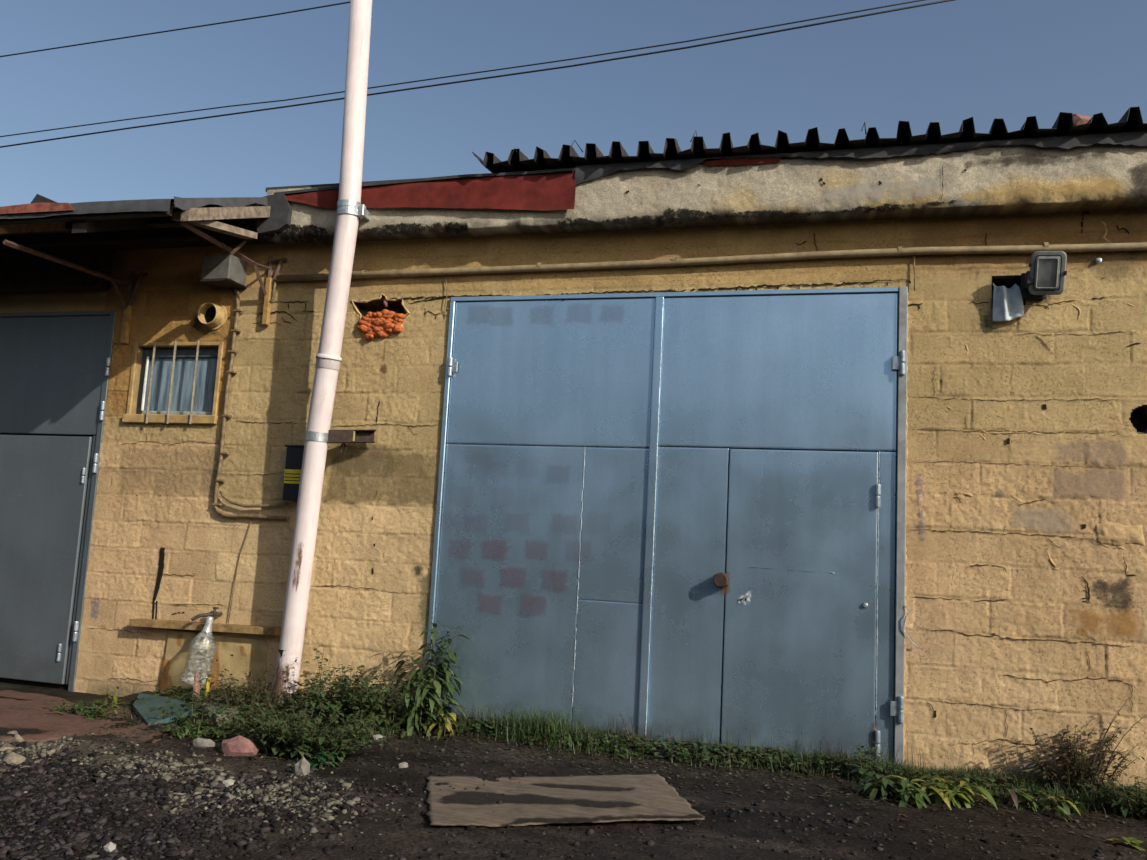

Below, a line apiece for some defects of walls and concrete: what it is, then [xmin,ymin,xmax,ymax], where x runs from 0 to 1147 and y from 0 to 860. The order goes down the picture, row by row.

damp [1131,164,1147,197]
damp [262,224,330,245]
damp [364,221,469,236]
damp [557,200,956,229]
spalling [350,293,410,341]
crack [910,378,1130,469]
crack [910,496,1136,576]
rust [293,545,302,590]
crack [1081,576,1090,603]
damp [1080,578,1137,633]
crack [930,629,1133,713]
crack [919,697,1129,776]